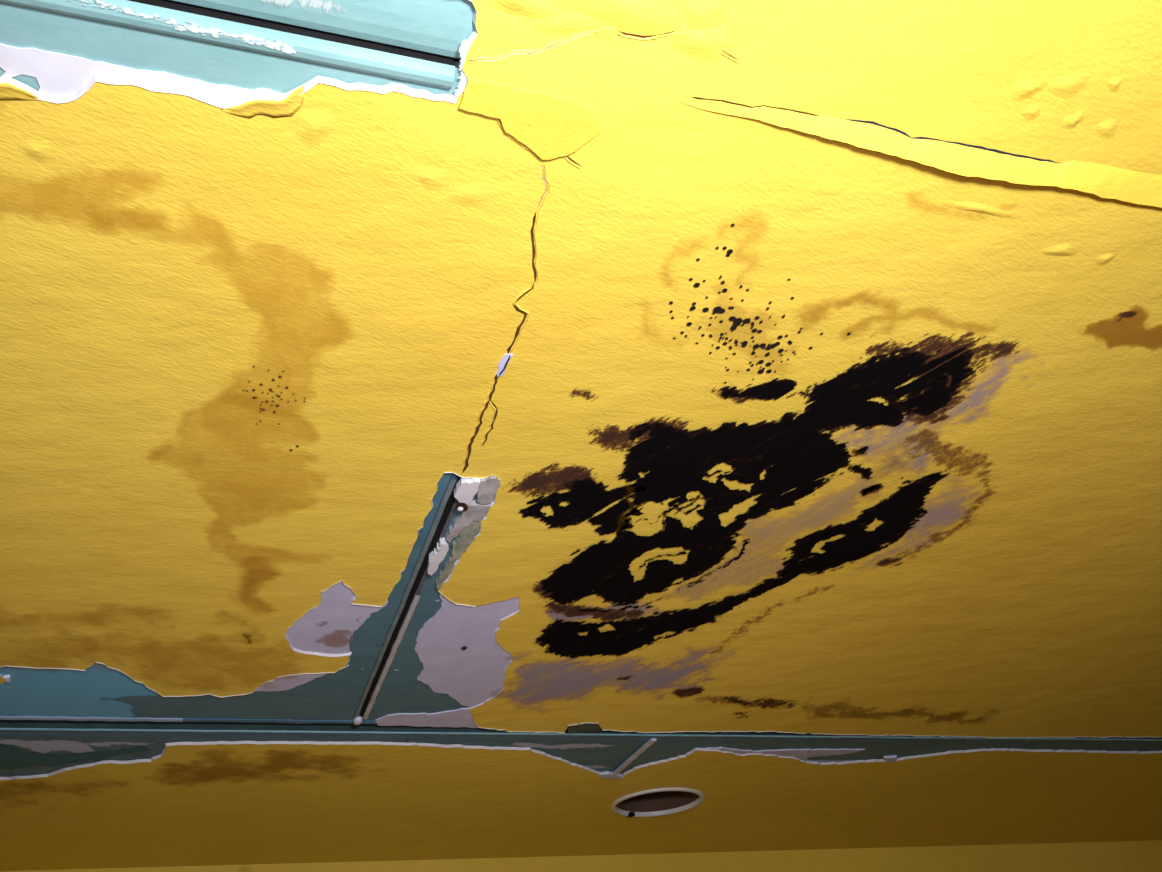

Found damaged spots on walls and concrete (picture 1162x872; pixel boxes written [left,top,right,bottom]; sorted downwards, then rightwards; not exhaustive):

peeling [0,0,478,119]
crack [469,27,697,62]
crack [718,50,740,63]
crack [460,118,582,474]
damp [1086,309,1162,348]
damp [242,366,306,425]
mould [495,275,1022,719]
peeling [0,472,1162,780]